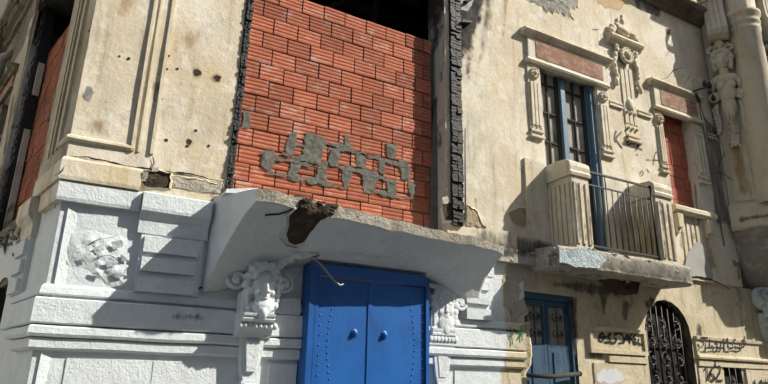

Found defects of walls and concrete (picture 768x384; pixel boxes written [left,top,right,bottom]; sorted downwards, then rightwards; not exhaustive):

spalling [526,0,580,21]
peeling [597,0,624,10]
crack [56,155,223,182]
spalling [279,195,339,250]
spalling [506,206,527,229]
spalling [501,247,676,377]